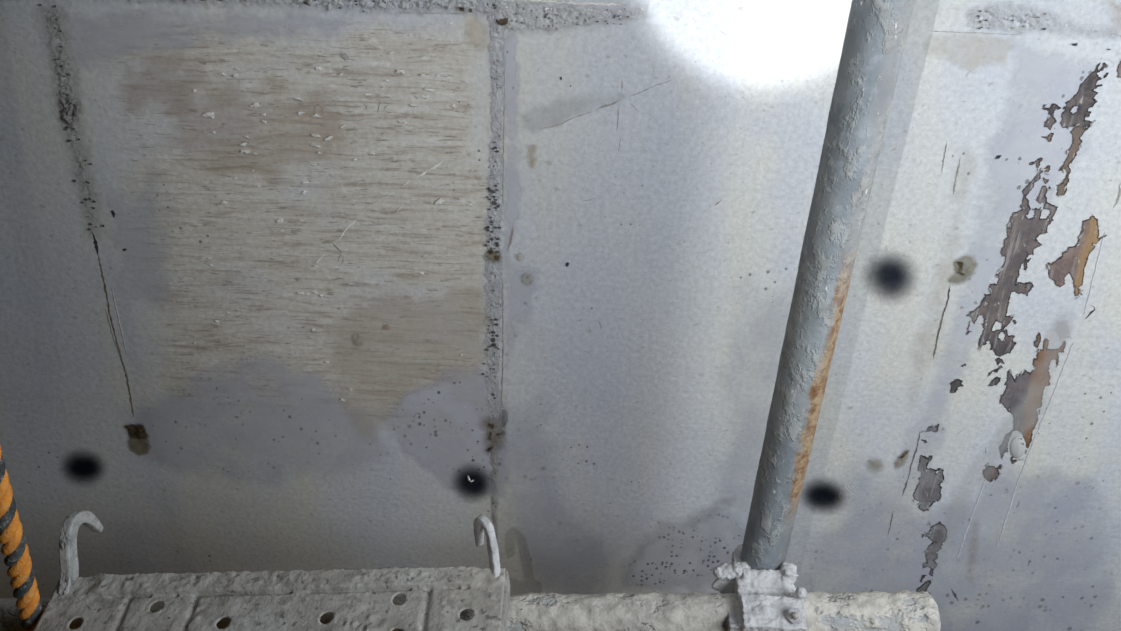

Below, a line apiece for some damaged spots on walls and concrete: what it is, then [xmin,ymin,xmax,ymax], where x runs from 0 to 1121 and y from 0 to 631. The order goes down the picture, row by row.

spalling [950,256,978,283]
peeling [966,49,1121,482]
crack [92,232,134,415]
peeling [950,364,966,393]
leakage [399,376,505,492]
peeling [896,424,944,512]
leakage [626,518,744,587]
peeling [917,522,947,592]